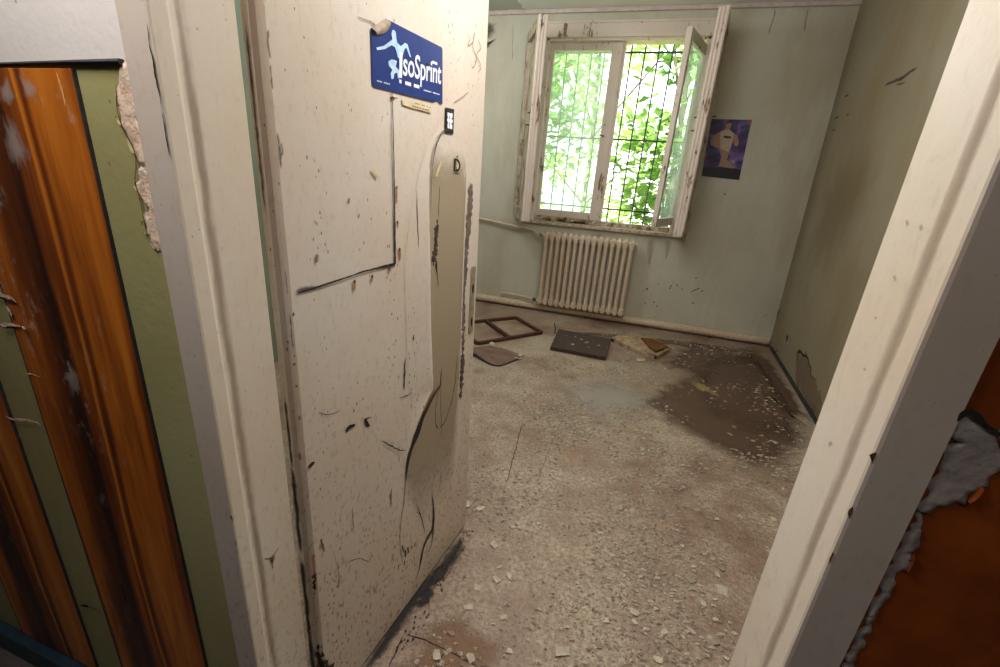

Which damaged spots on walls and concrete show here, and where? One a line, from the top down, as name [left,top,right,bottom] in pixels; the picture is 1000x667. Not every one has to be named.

flaking render [115,62,161,251]
leakage [650,339,800,462]
flaking render [795,350,822,418]
spalling [842,410,1000,667]